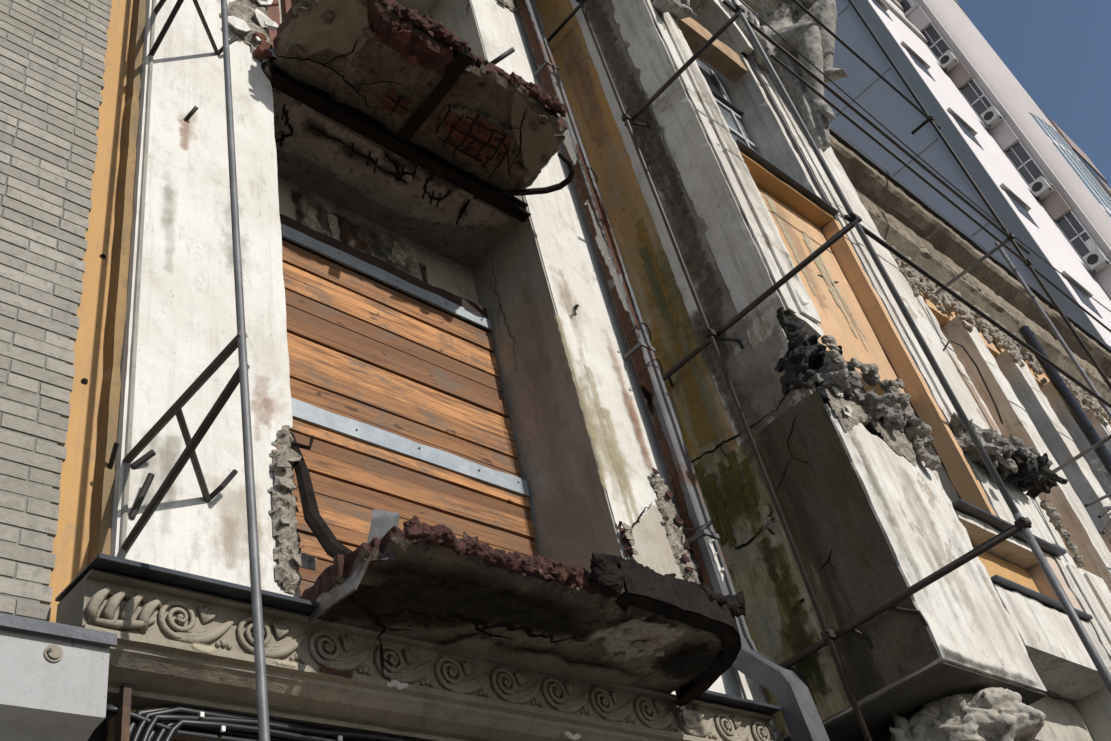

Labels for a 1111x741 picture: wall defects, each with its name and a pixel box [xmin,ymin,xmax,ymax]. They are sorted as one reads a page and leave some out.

peeling [219,0,375,75]
crack [278,36,409,115]
spalling [272,89,510,227]
crack [500,108,527,169]
peeling [511,92,577,185]
flaking render [268,425,317,598]
peeling [618,468,704,584]
water stain [587,0,827,703]
crack [691,381,816,549]
spalling [774,307,941,471]
spalling [942,344,1085,567]
crack [349,595,593,674]